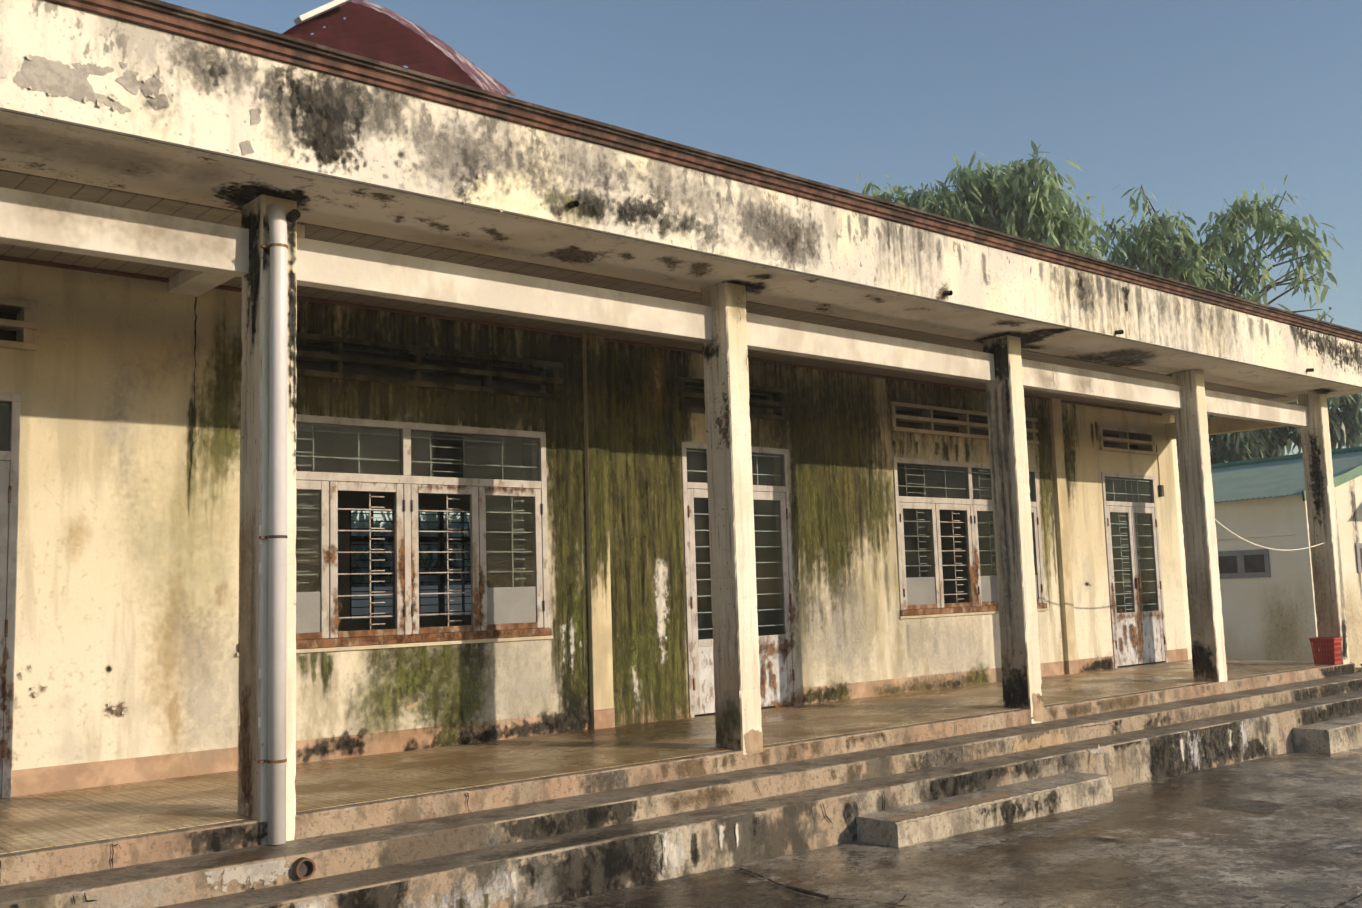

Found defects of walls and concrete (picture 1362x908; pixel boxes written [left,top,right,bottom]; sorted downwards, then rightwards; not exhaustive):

peeling [13,54,169,114]
peeling [240,140,254,155]
peeling [250,109,261,125]
water stain [171,35,544,456]
mould [582,152,820,282]
rust [0,647,11,760]
rust [331,540,526,643]
rust [760,605,799,709]
rust [1112,576,1163,661]
water stain [439,770,864,908]
crack [739,868,915,908]
water stain [884,693,1270,900]